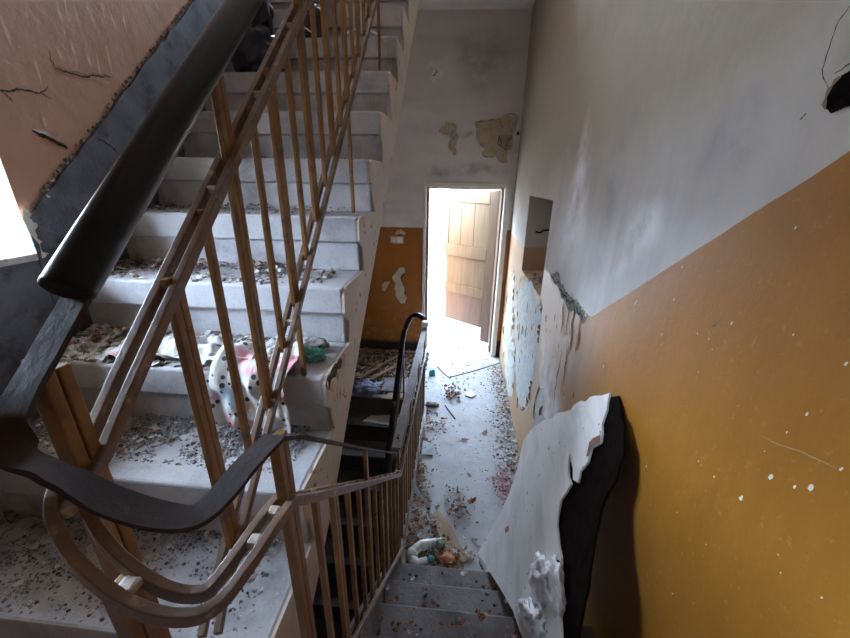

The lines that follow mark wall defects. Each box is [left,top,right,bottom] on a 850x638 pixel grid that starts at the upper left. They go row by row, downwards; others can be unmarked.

crack [0,52,114,102]
spalling [821,6,850,113]
spalling [23,0,195,258]
spalling [439,122,459,155]
spalling [475,113,519,163]
peeling [382,267,407,304]
spalling [550,271,587,323]
peeling [503,270,544,419]
spalling [326,355,345,392]